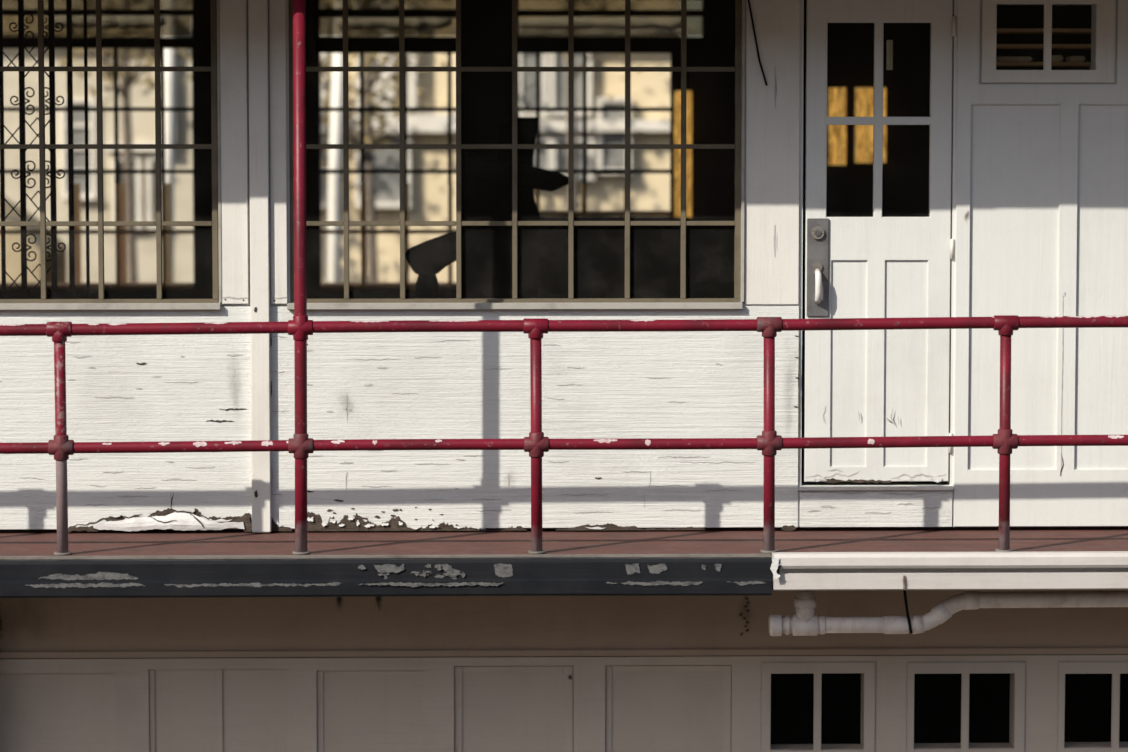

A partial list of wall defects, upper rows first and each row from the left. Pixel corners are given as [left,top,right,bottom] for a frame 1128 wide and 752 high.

peeling [68,494,252,533]
peeling [271,516,292,531]
peeling [307,507,527,531]
peeling [25,572,145,588]
peeling [357,563,513,587]
peeling [606,563,722,586]
spalling [733,557,781,586]